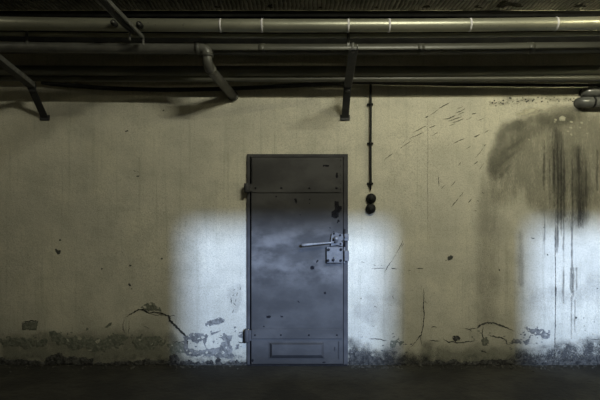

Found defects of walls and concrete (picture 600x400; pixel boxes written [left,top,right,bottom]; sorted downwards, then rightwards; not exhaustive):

peeling [0,317,254,365]
crack [123,309,188,344]
crack [412,289,513,346]
spalling [348,325,600,365]